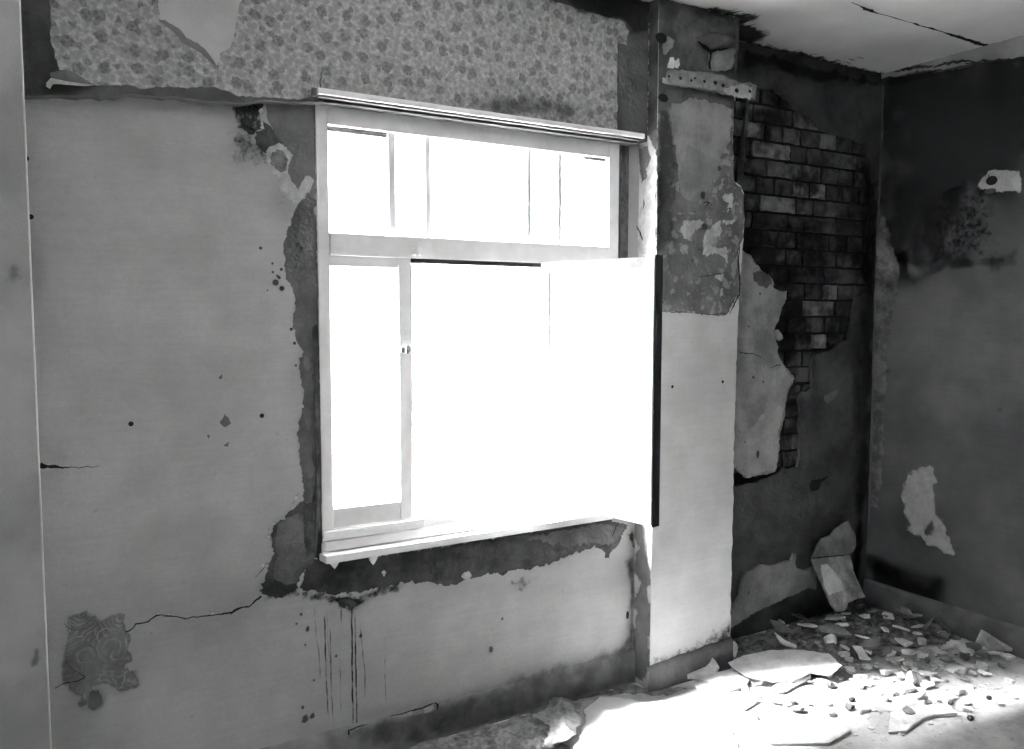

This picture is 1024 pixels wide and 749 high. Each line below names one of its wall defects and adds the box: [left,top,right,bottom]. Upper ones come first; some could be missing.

crack [851,2,988,46]
flaking render [637,0,901,508]
spalling [233,103,628,611]
crack [40,462,98,470]
crack [125,562,268,634]
crack [55,661,86,689]
peeling [59,612,139,710]
leakage [296,609,366,721]